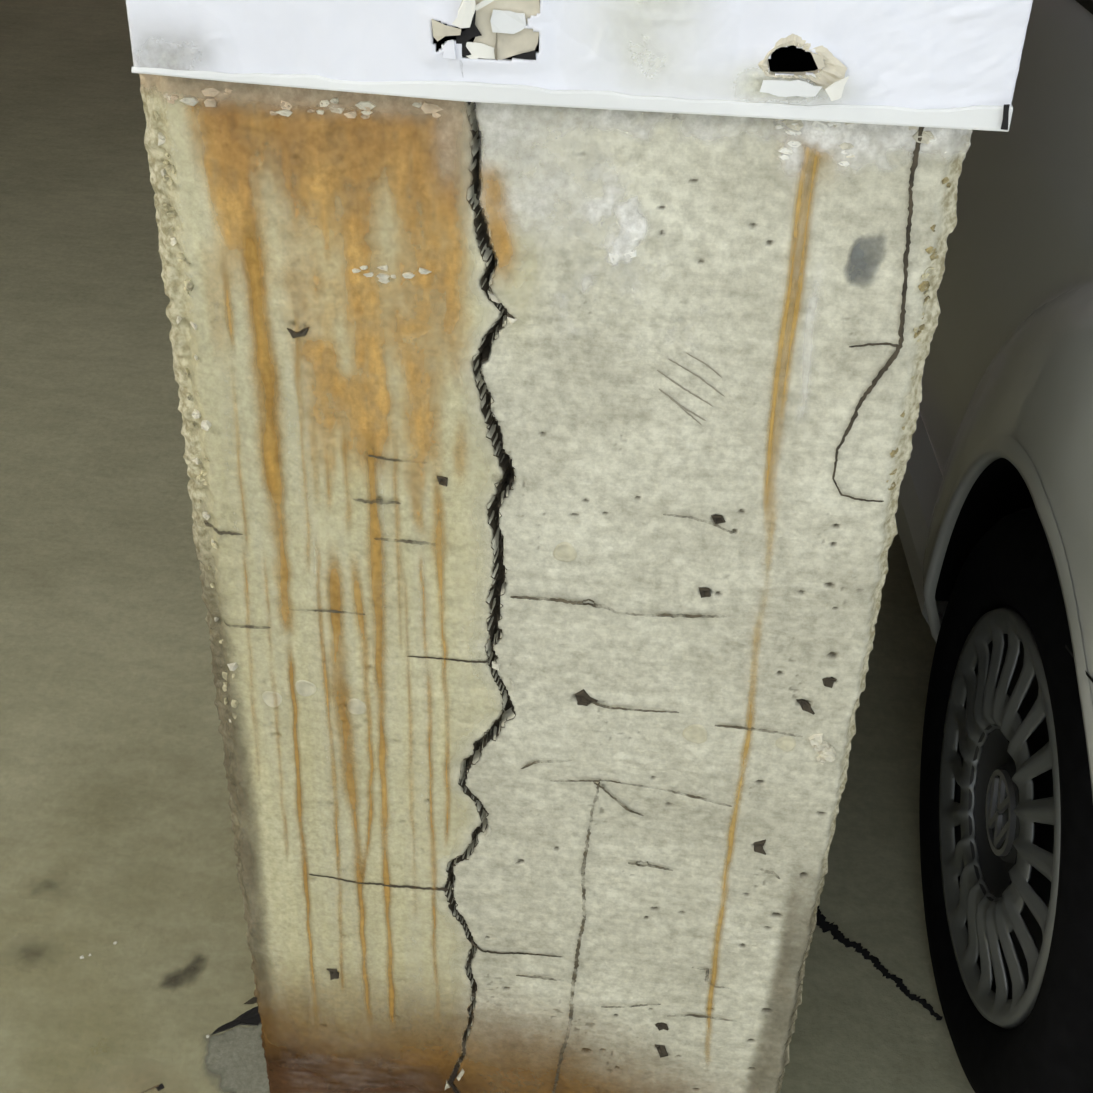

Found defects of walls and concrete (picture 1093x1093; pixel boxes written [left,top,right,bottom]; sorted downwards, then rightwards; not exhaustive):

peeling [432,0,540,60]
rust [766,140,820,498]
crack [832,127,924,502]
rust [192,98,646,1093]
crack [309,102,715,1093]
crack [663,514,733,534]
crack [669,790,732,807]
crack [685,1013,730,1021]
rust [707,702,752,1029]
crack [816,906,943,1020]